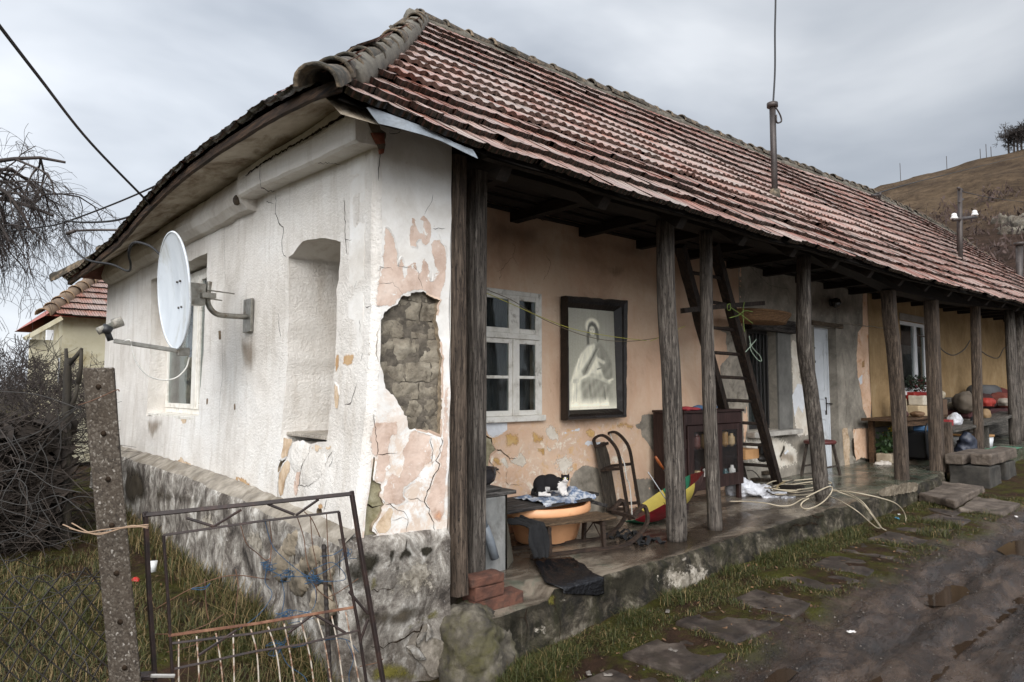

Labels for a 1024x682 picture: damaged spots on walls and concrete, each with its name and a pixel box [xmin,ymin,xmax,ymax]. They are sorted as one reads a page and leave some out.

crack [246,115,345,256]
flaking render [363,216,448,536]
flaking render [278,438,300,496]
crack [375,438,443,550]
peeling [486,422,526,468]
damp [605,514,748,599]